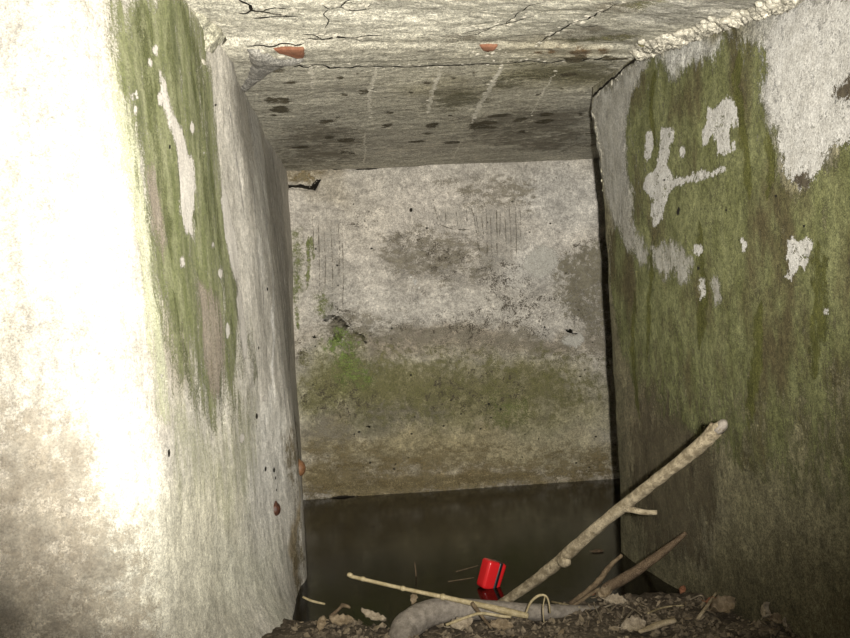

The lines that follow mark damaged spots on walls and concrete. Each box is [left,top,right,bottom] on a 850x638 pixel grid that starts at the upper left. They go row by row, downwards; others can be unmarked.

water stain [146,165,166,256]
crack [222,0,636,171]
water stain [421,59,616,151]
peeling [578,0,850,306]
water stain [794,170,810,190]
water stain [831,73,850,103]
water stain [196,281,226,401]
water stain [281,352,619,500]
water stain [630,382,706,493]
water stain [631,448,717,569]